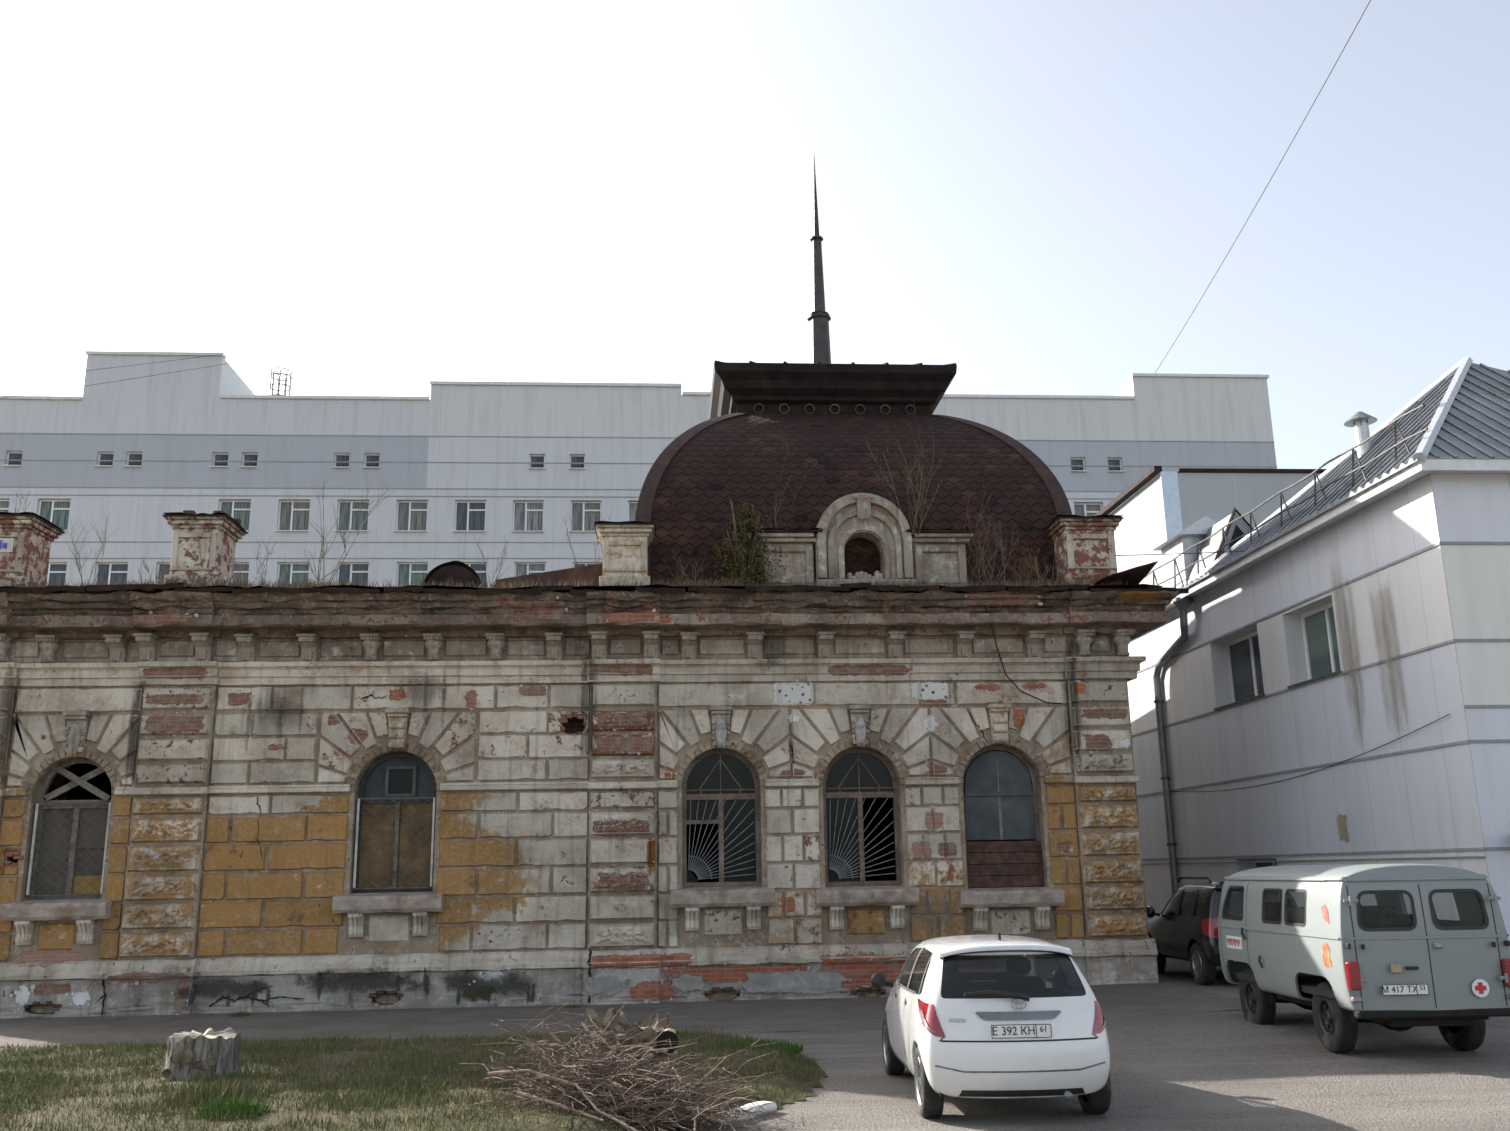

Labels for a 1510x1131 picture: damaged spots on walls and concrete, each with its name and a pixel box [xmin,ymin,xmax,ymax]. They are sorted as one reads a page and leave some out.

flaking render [131,611,199,624]
flaking render [558,711,653,755]
flaking render [1072,680,1131,753]
water stain [177,977,270,1006]
water stain [298,968,535,1005]
flaking render [589,948,932,1003]